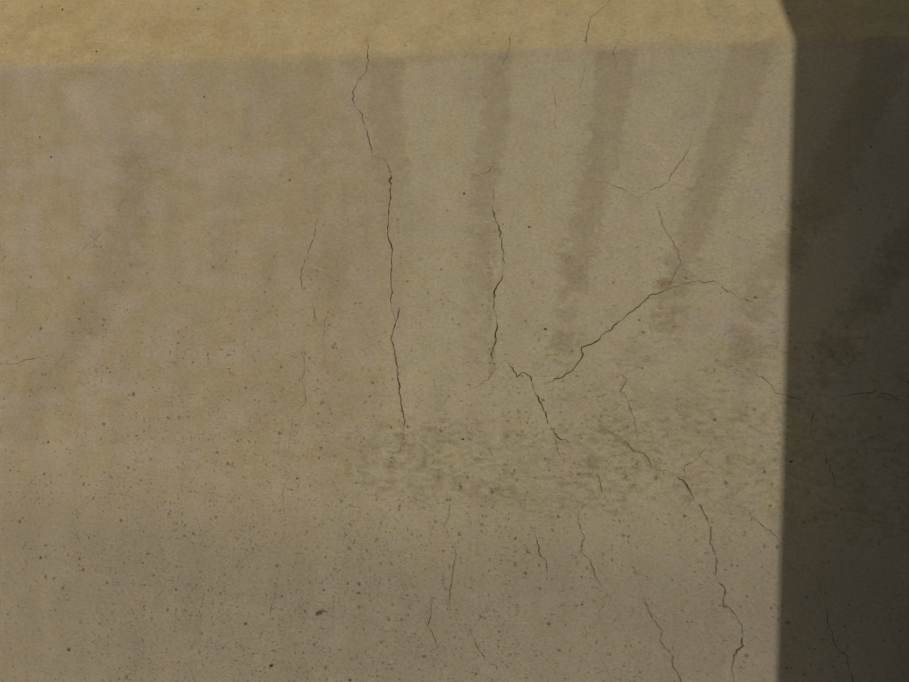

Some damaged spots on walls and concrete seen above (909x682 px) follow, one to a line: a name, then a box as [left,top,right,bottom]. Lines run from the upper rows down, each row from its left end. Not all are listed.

crack [352,39,439,471]
crack [475,145,757,451]
crack [577,373,751,678]